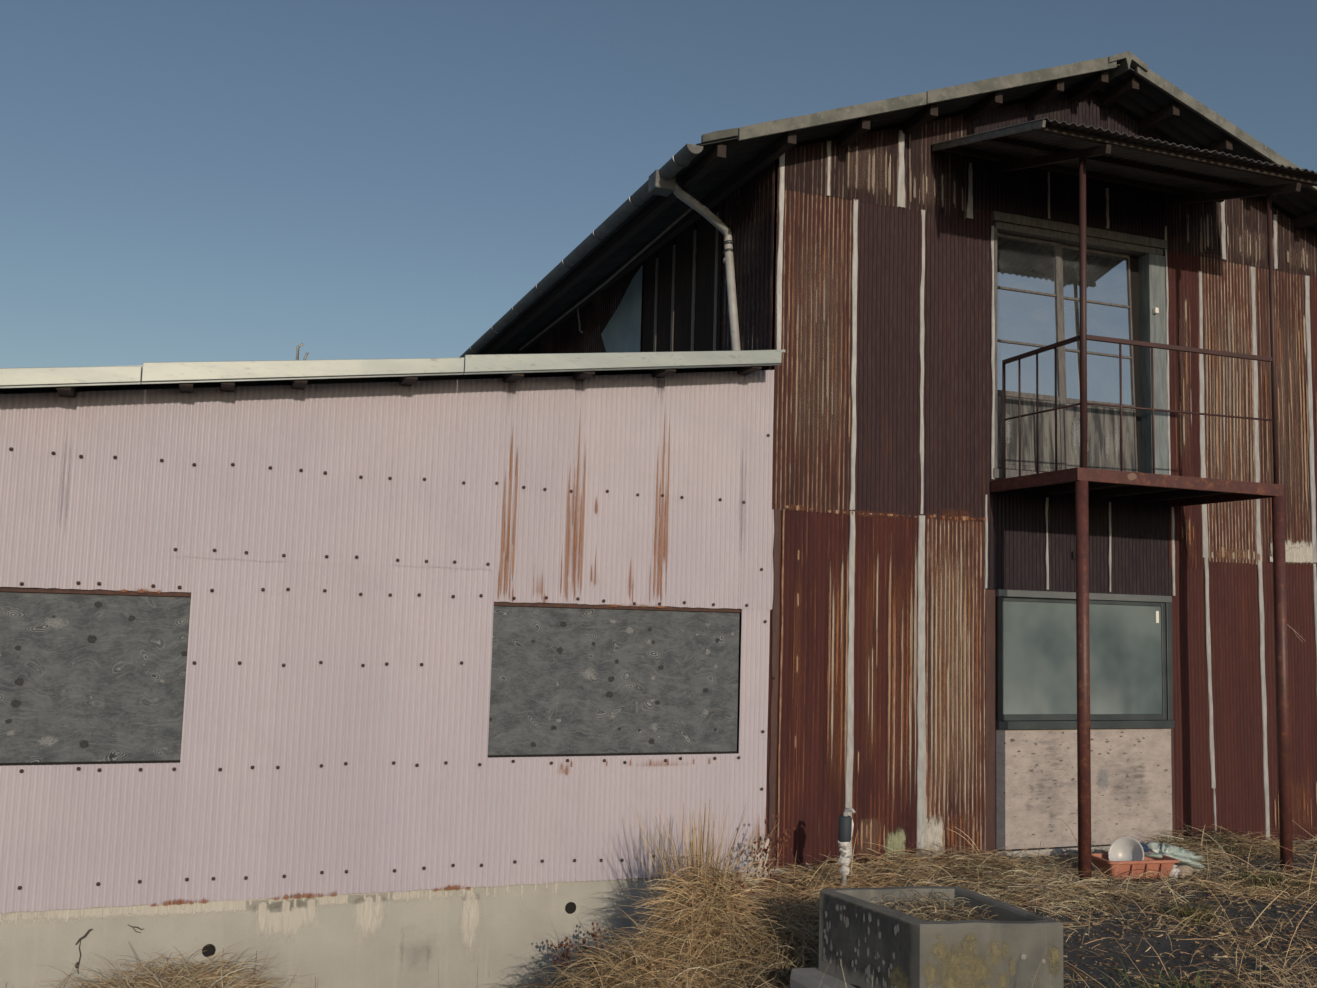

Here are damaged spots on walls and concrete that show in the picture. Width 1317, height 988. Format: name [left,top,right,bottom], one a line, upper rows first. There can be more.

corrosion [848,148,891,194]
corrosion [909,169,963,211]
corrosion [1187,214,1260,261]
corrosion [788,222,850,438]
corrosion [1180,307,1317,509]
corrosion [498,435,518,601]
corrosion [560,430,597,599]
corrosion [649,421,670,608]
peeling [1270,540,1313,563]
corrosion [827,562,859,774]
corrosion [868,541,978,853]
water stain [0,883,557,948]